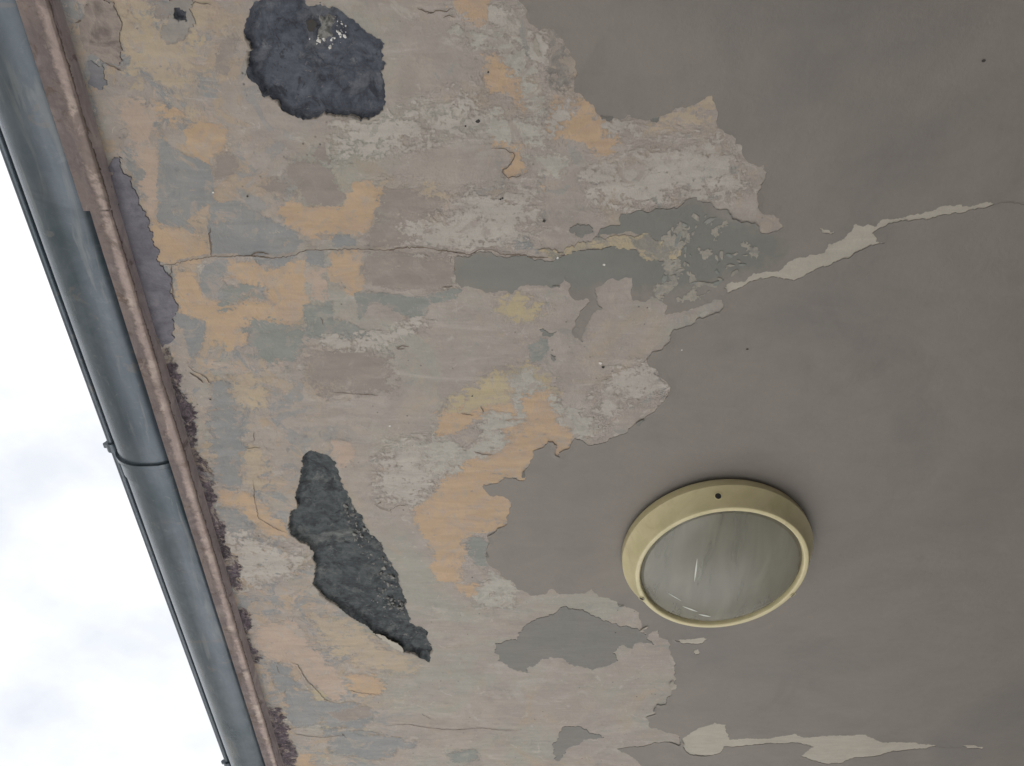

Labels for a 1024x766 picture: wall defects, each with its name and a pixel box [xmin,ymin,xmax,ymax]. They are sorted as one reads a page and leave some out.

crack [160,231,636,298]
peeling [725,202,993,293]
peeling [60,0,783,766]
peeling [682,723,936,764]